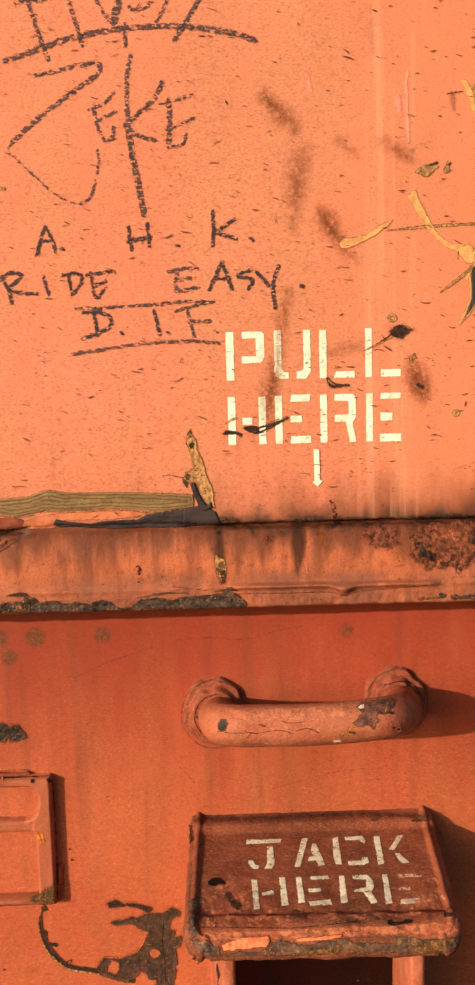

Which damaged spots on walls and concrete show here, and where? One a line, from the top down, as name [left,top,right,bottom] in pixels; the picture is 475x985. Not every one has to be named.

peeling [414,161,451,177]
spalling [458,259,475,324]
corrosion [0,587,247,615]
peeling [0,723,26,742]
peeling [333,697,402,742]
peeling [200,877,458,940]
peeling [97,900,182,985]